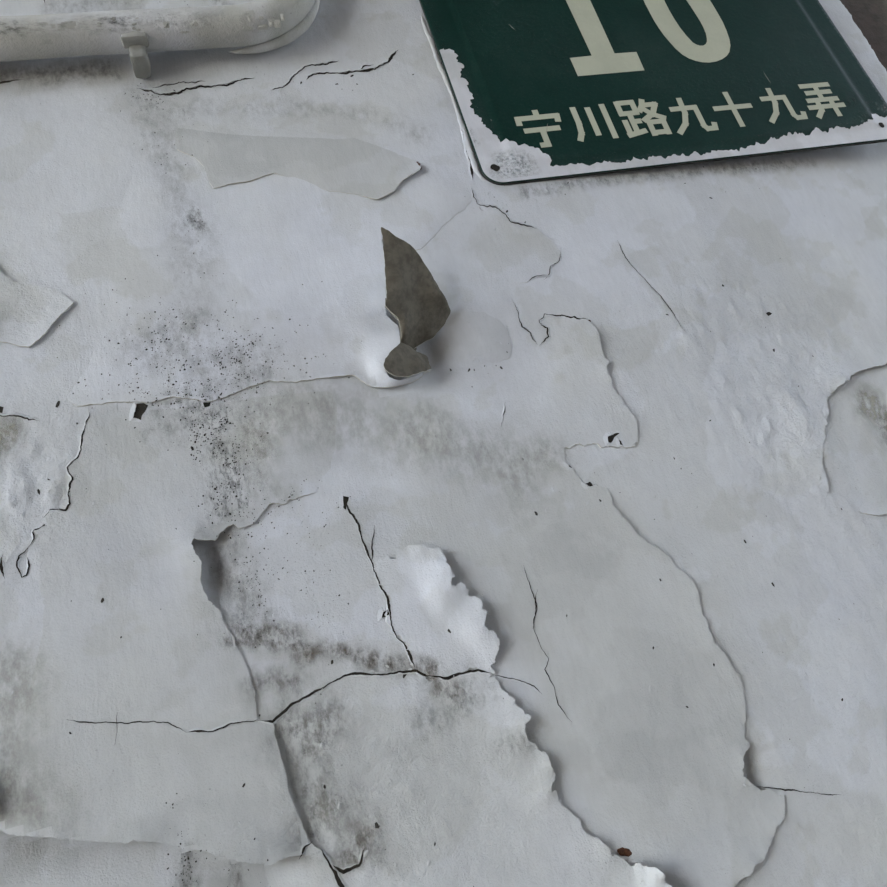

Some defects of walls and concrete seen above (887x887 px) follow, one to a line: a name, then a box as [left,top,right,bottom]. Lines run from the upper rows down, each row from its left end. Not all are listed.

crack [137,50,398,96]
peeling [0,125,785,887]
peeling [770,341,887,534]
crack [73,504,572,741]
crack [298,840,365,887]